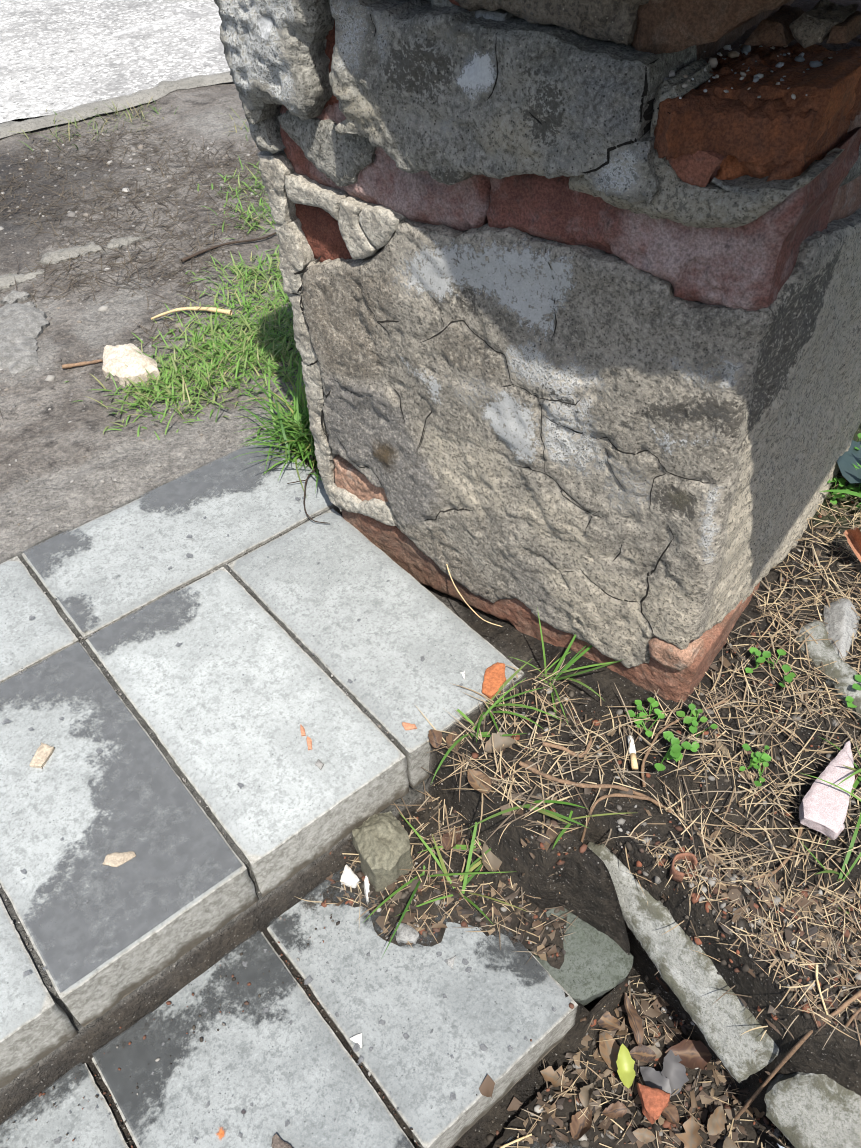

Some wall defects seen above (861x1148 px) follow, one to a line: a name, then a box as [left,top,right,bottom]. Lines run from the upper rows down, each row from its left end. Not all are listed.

flaking render [257,149,406,526]
crack [292,256,383,487]
crack [361,291,399,334]
crack [393,387,432,450]
crack [420,288,715,635]